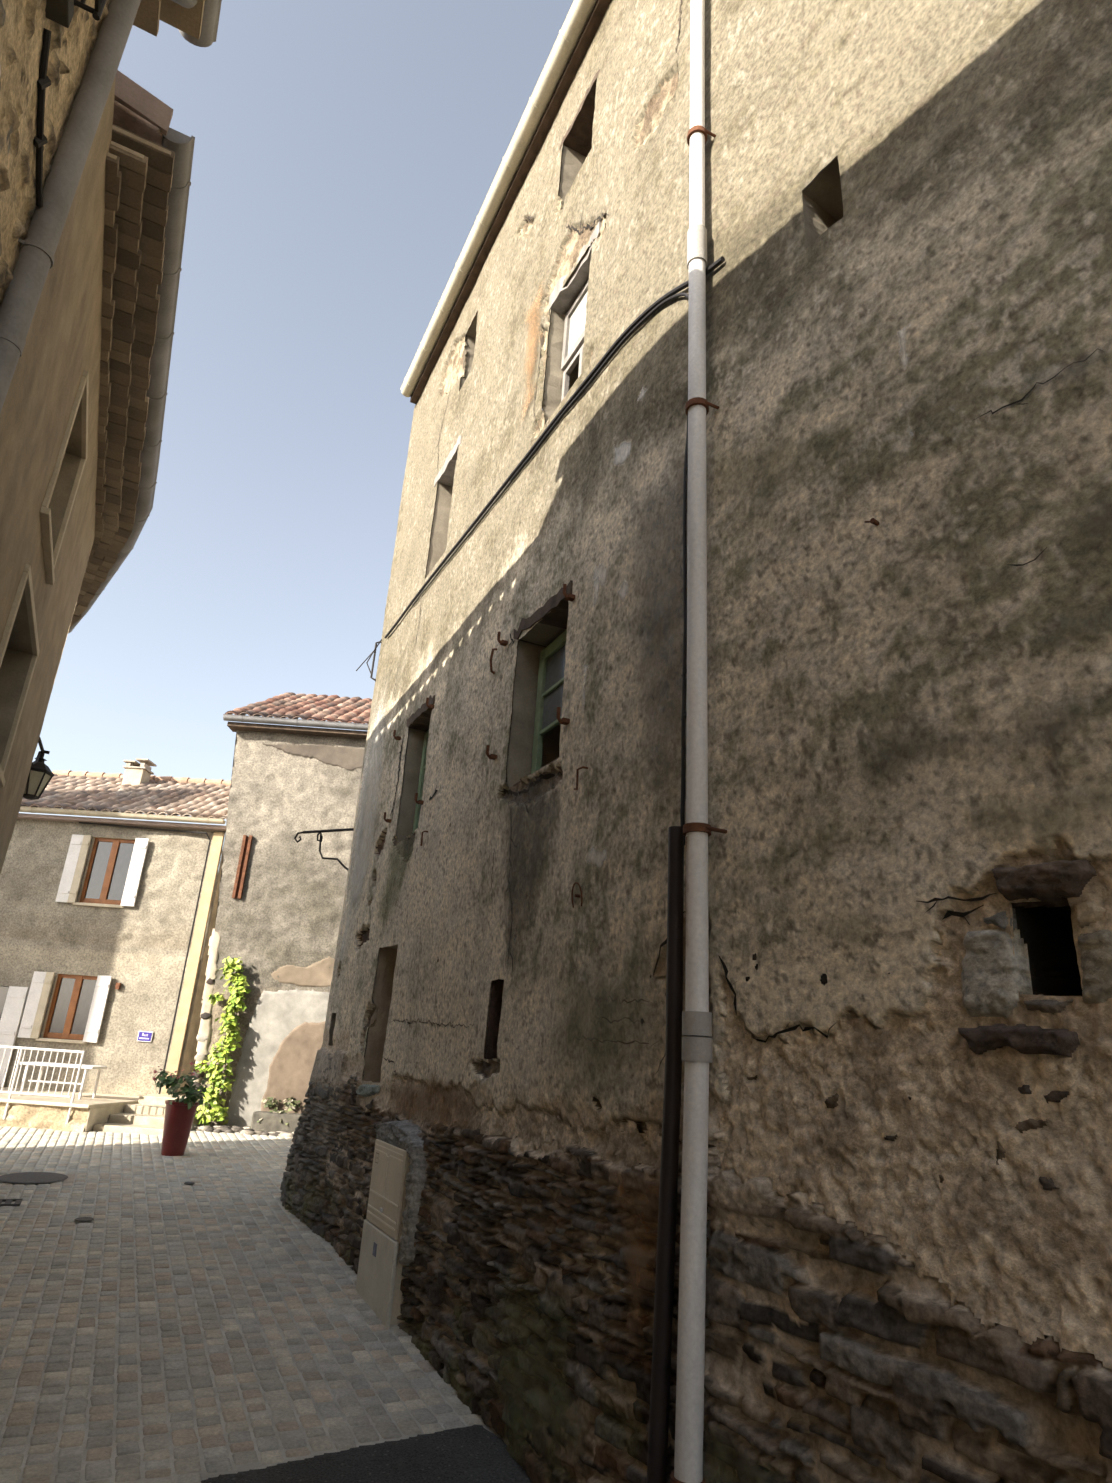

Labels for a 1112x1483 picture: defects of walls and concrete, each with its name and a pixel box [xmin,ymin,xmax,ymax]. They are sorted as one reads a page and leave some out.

crack [718,955,835,1043]
flaking render [389,1059,683,1169]
flaking render [717,840,1112,1369]